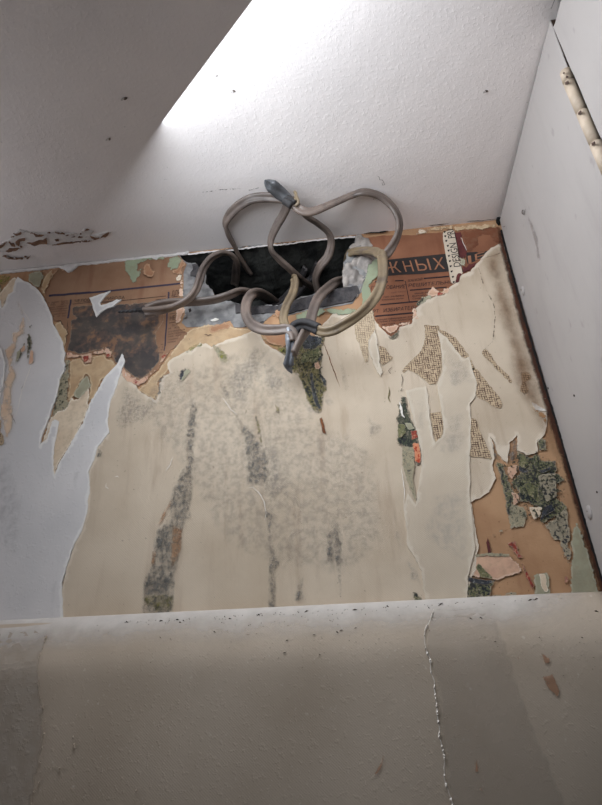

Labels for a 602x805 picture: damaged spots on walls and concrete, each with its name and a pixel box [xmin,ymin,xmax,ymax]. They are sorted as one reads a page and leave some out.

spalling [0,228,367,328]
water stain [294,336,324,406]
water stain [243,429,267,482]
water stain [144,405,196,613]